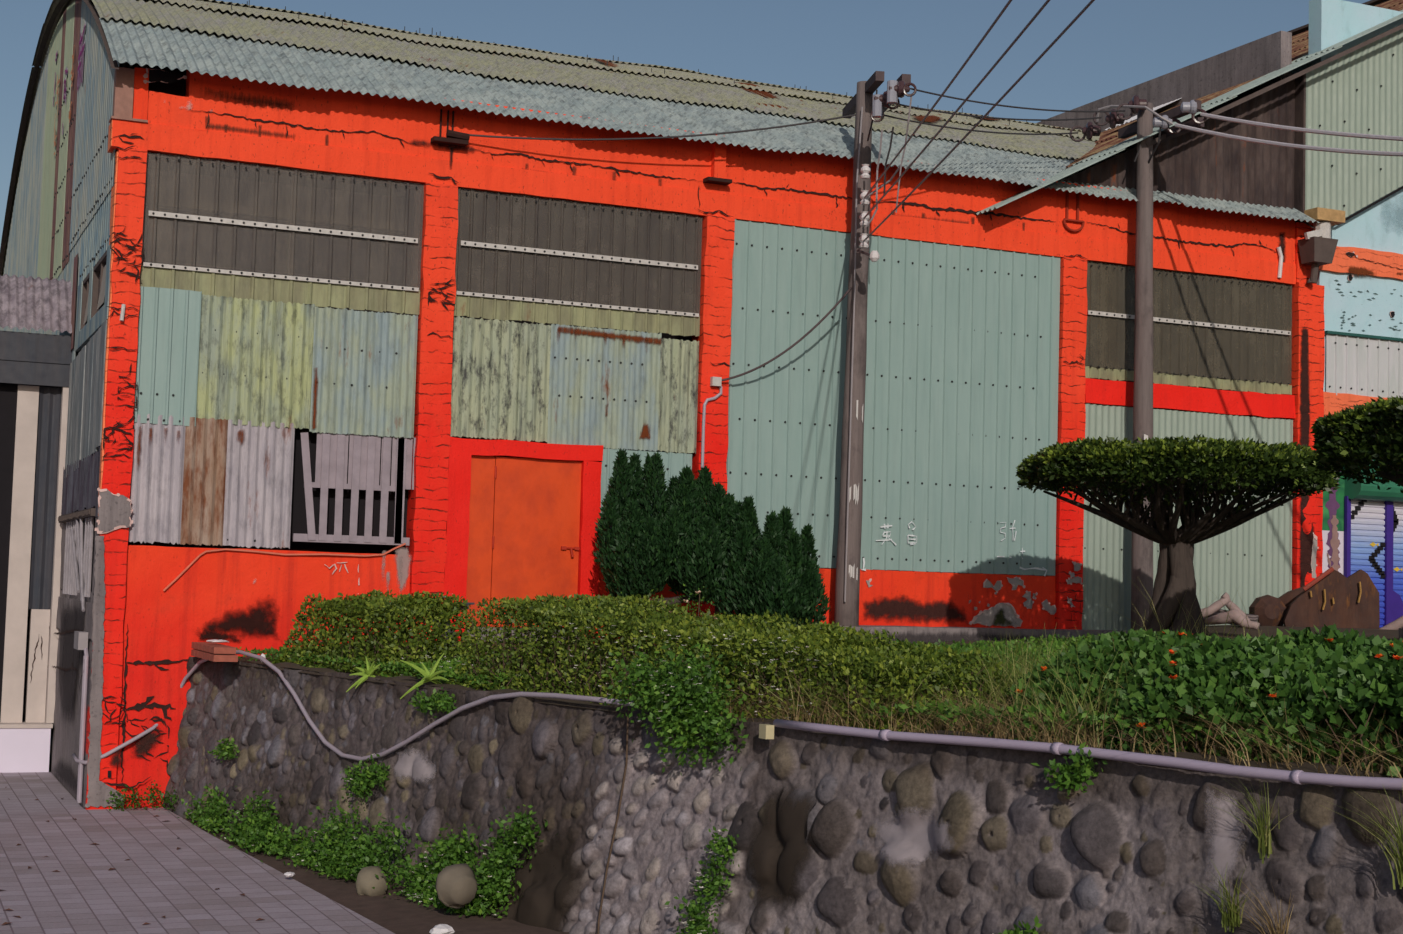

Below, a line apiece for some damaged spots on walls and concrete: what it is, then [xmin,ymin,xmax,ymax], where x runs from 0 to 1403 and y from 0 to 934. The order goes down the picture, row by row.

crack [114,133,145,159]
crack [192,110,458,185]
crack [475,149,1054,222]
crack [1088,222,1275,258]
spalling [94,488,133,534]
water stain [204,602,276,636]
water stain [864,597,966,621]
peeling [969,561,1083,628]
crack [30,625,189,790]